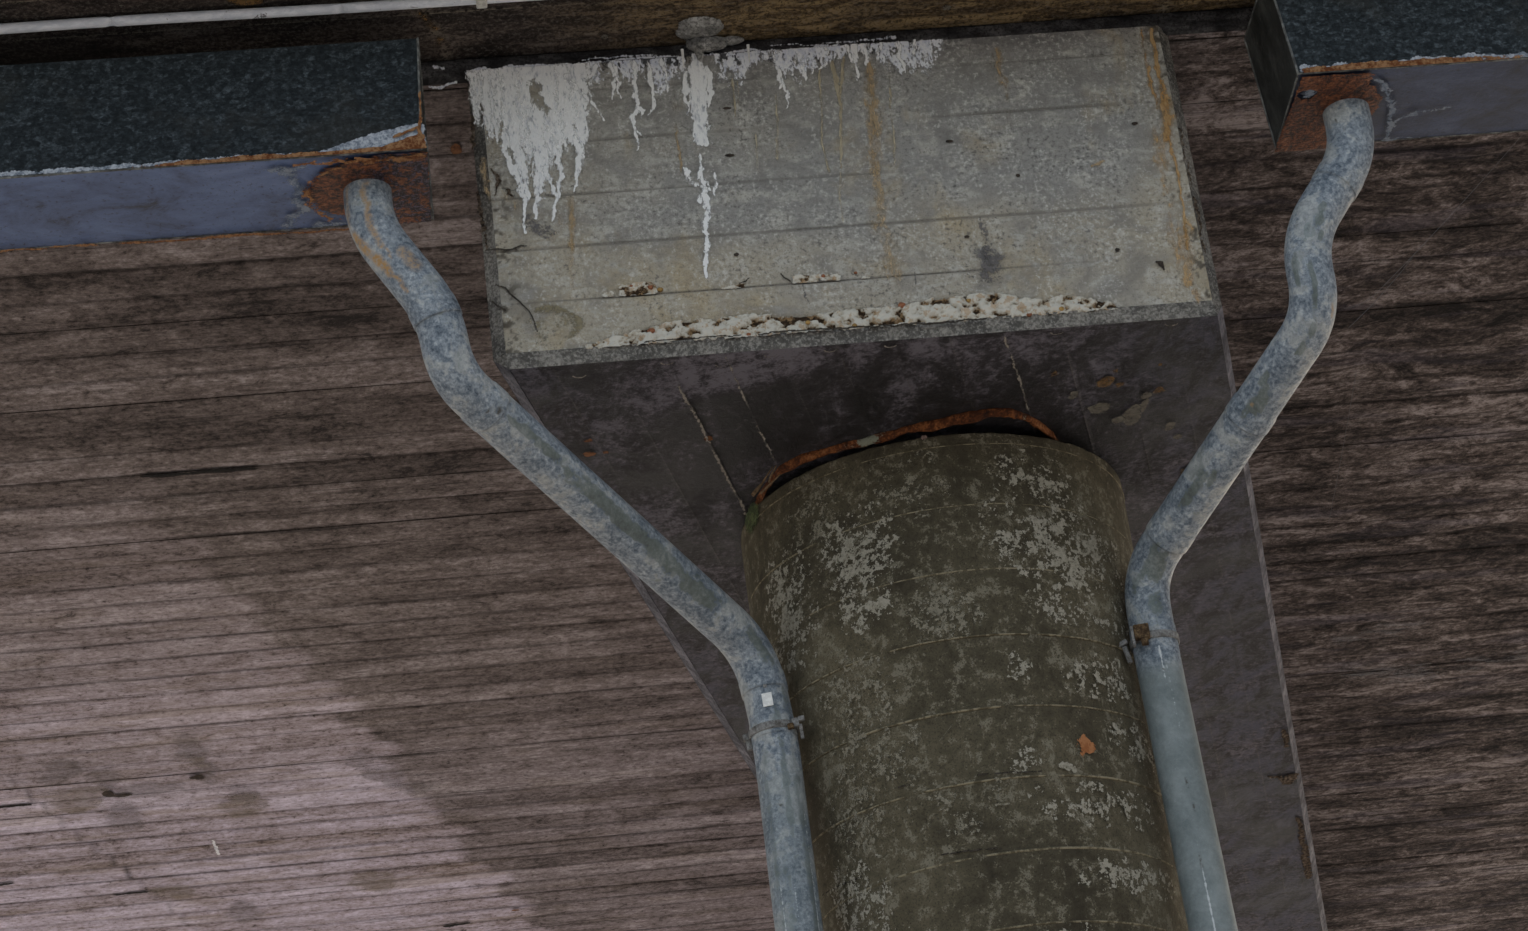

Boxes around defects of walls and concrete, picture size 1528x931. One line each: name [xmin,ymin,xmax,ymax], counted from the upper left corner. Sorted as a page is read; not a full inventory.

corrosion [0,91,431,244]
damp [429,35,944,279]
corrosion [1275,52,1528,152]
peeling [978,449,1129,636]
peeling [765,435,1042,931]
peeling [1062,653,1157,776]
peeling [1027,781,1154,831]
peeling [1075,854,1175,901]